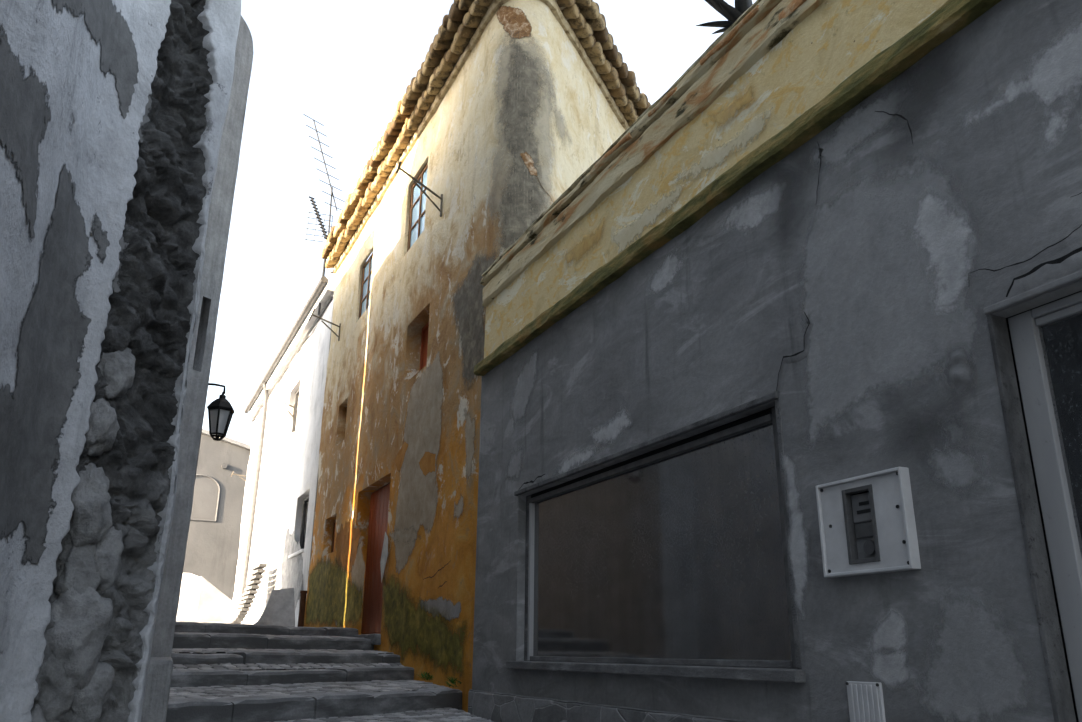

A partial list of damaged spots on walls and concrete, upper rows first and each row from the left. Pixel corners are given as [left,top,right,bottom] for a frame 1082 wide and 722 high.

spalling [496,6,532,39]
leakage [452,39,565,388]
crack [815,142,827,205]
crack [968,224,1082,298]
spalling [0,0,228,722]
crack [776,312,814,392]
peeling [390,351,443,573]